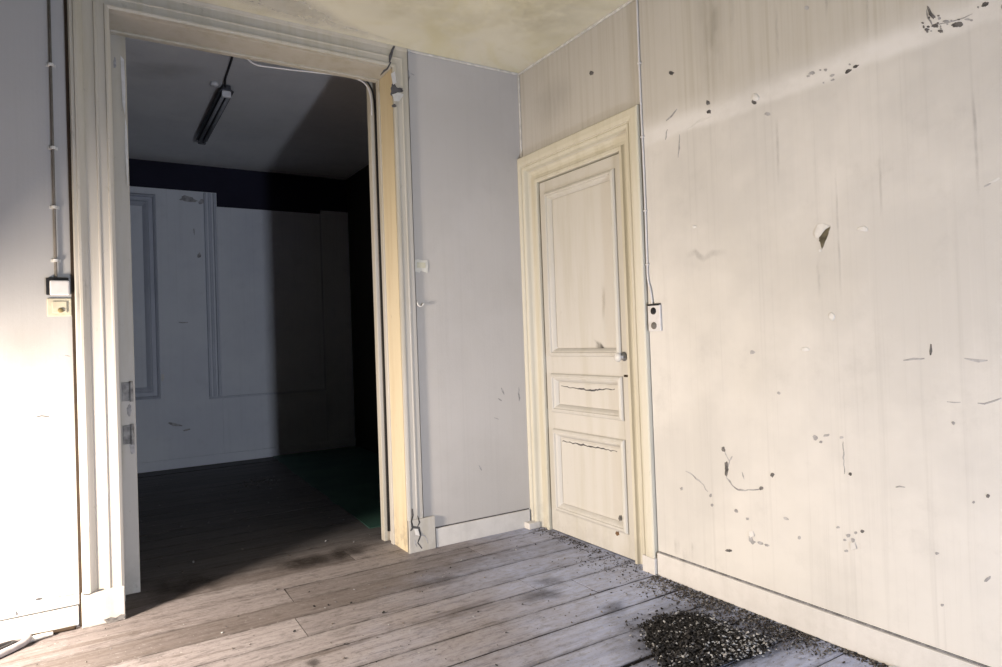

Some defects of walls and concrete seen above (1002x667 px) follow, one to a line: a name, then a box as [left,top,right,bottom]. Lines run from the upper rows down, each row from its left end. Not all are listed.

flaking render [921,2,989,33]
flaking render [814,223,830,252]